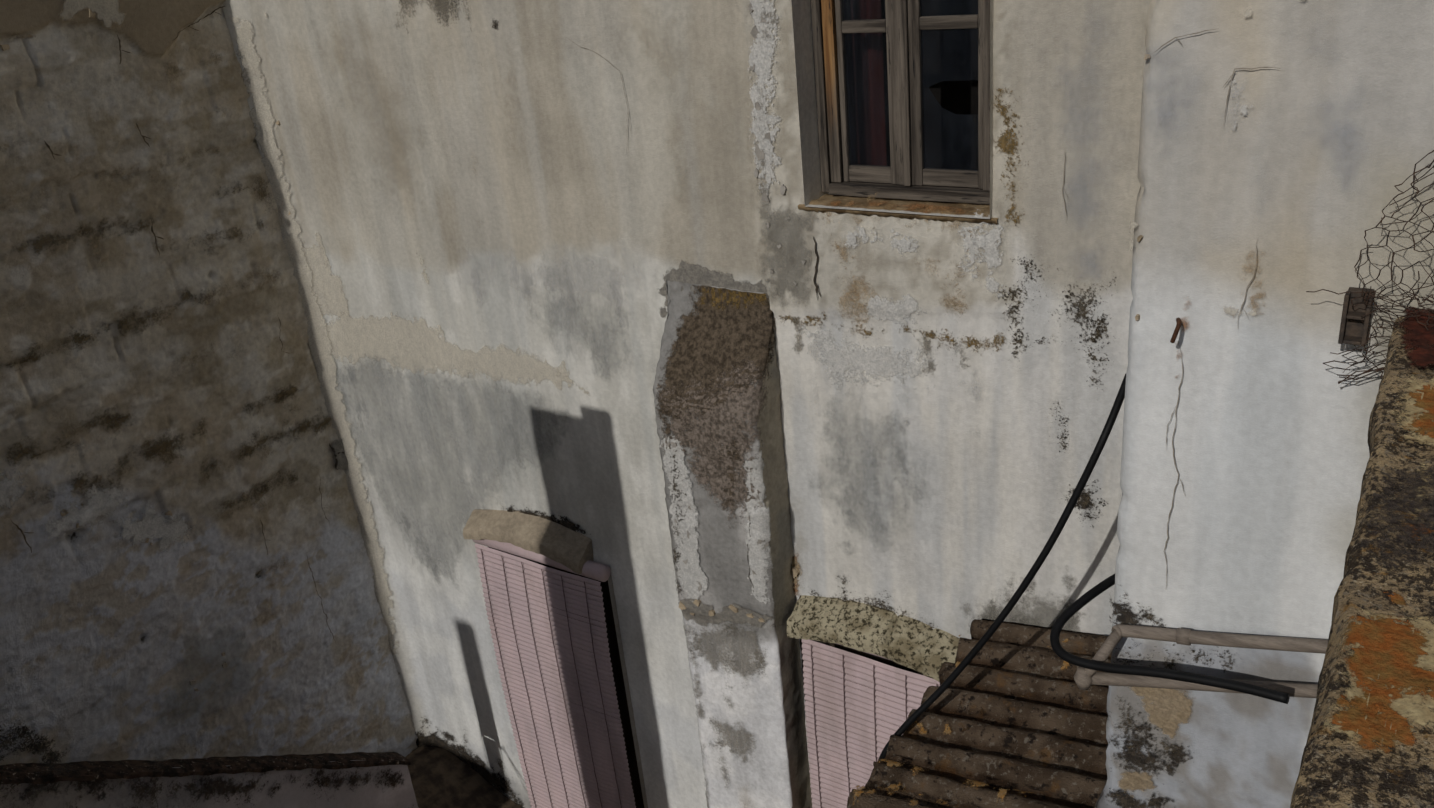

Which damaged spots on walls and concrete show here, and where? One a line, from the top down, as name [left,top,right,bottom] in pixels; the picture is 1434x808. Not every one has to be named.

peeling [61,0,124,27]
damp [400,0,469,22]
mould [993,89,1024,224]
peeling [233,18,399,674]
damp [793,318,803,351]
mould [998,258,1116,385]
crack [1164,342,1186,586]
damp [0,720,404,808]